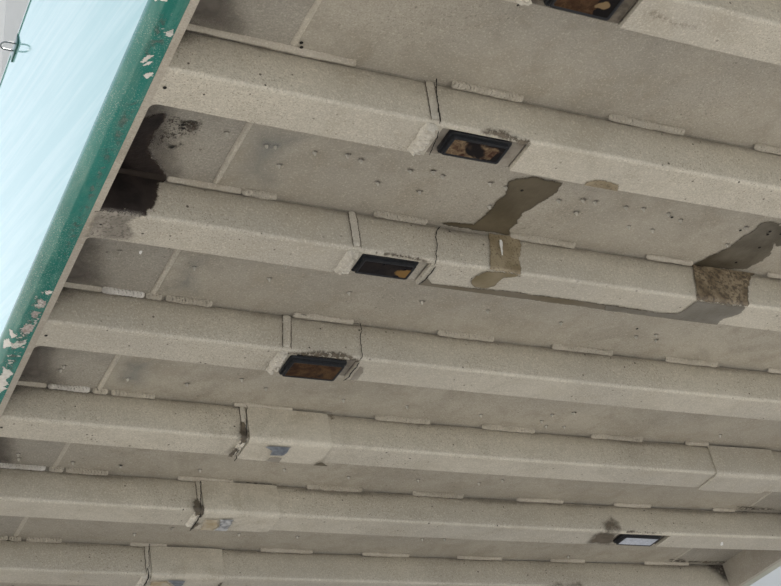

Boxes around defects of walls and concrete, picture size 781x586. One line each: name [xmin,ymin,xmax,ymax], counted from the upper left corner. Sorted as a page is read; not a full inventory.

peeling [140,55,154,79]
crack [429,79,441,155]
water stain [87,113,199,240]
crack [419,227,440,284]
peeling [0,290,53,393]
crack [345,323,363,380]